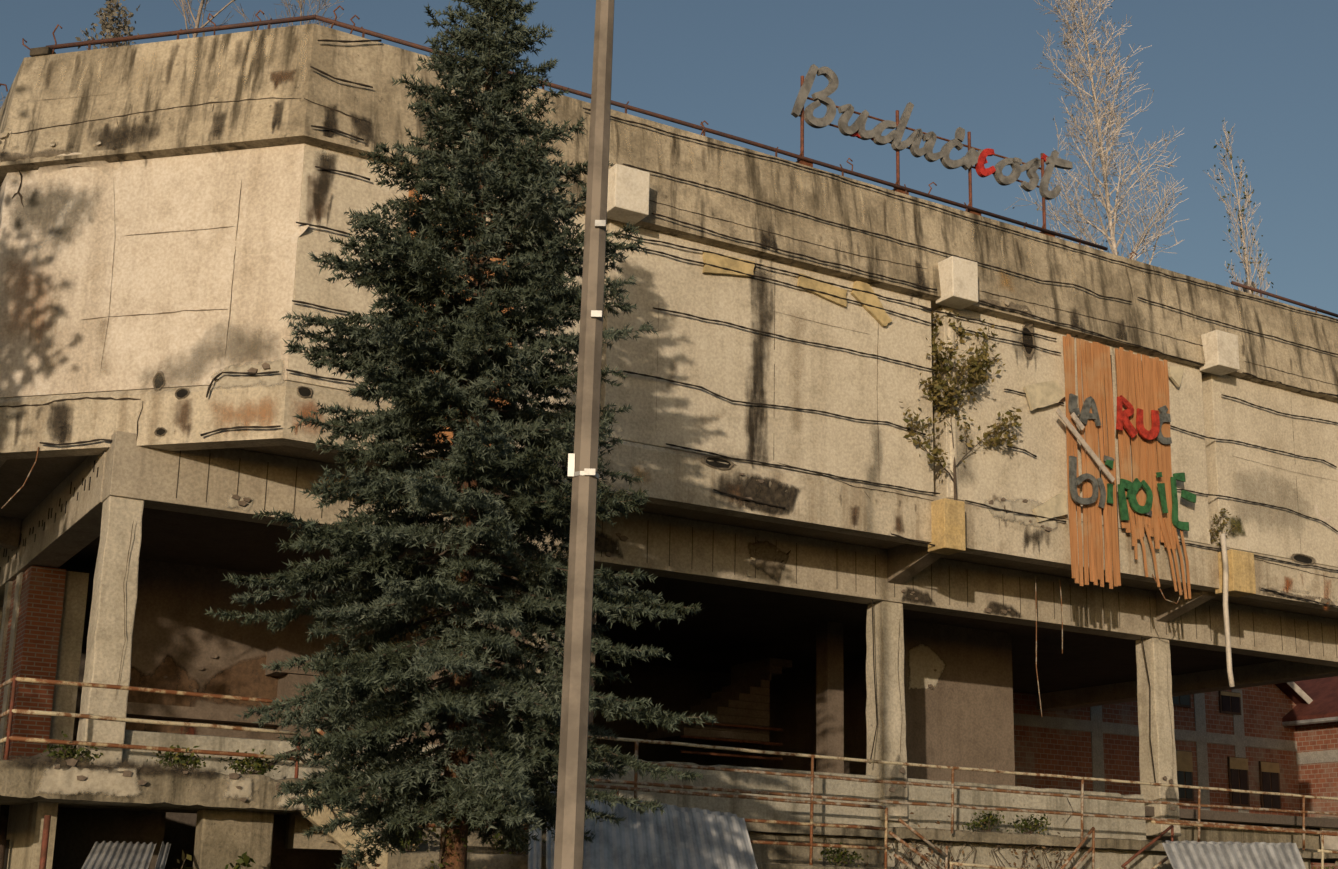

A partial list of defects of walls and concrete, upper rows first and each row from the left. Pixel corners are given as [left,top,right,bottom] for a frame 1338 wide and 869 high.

water stain [245,36,272,76]
water stain [271,70,295,85]
water stain [98,116,159,150]
water stain [213,114,225,136]
water stain [273,102,282,128]
water stain [324,106,373,147]
water stain [308,154,335,219]
water stain [15,190,89,244]
water stain [916,262,926,297]
water stain [746,267,773,465]
spalling [701,455,799,514]
peeling [908,644,945,690]